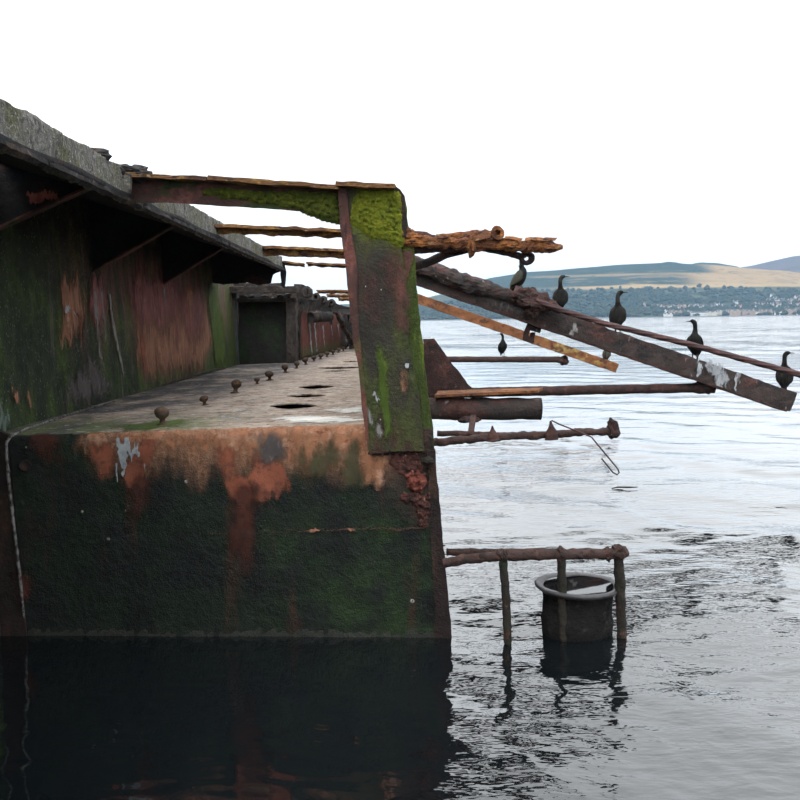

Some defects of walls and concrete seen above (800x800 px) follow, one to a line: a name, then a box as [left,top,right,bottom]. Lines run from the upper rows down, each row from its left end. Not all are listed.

rust [59,269,107,346]
rust [134,279,212,382]
rust [80,424,386,571]
crack [210,526,426,534]